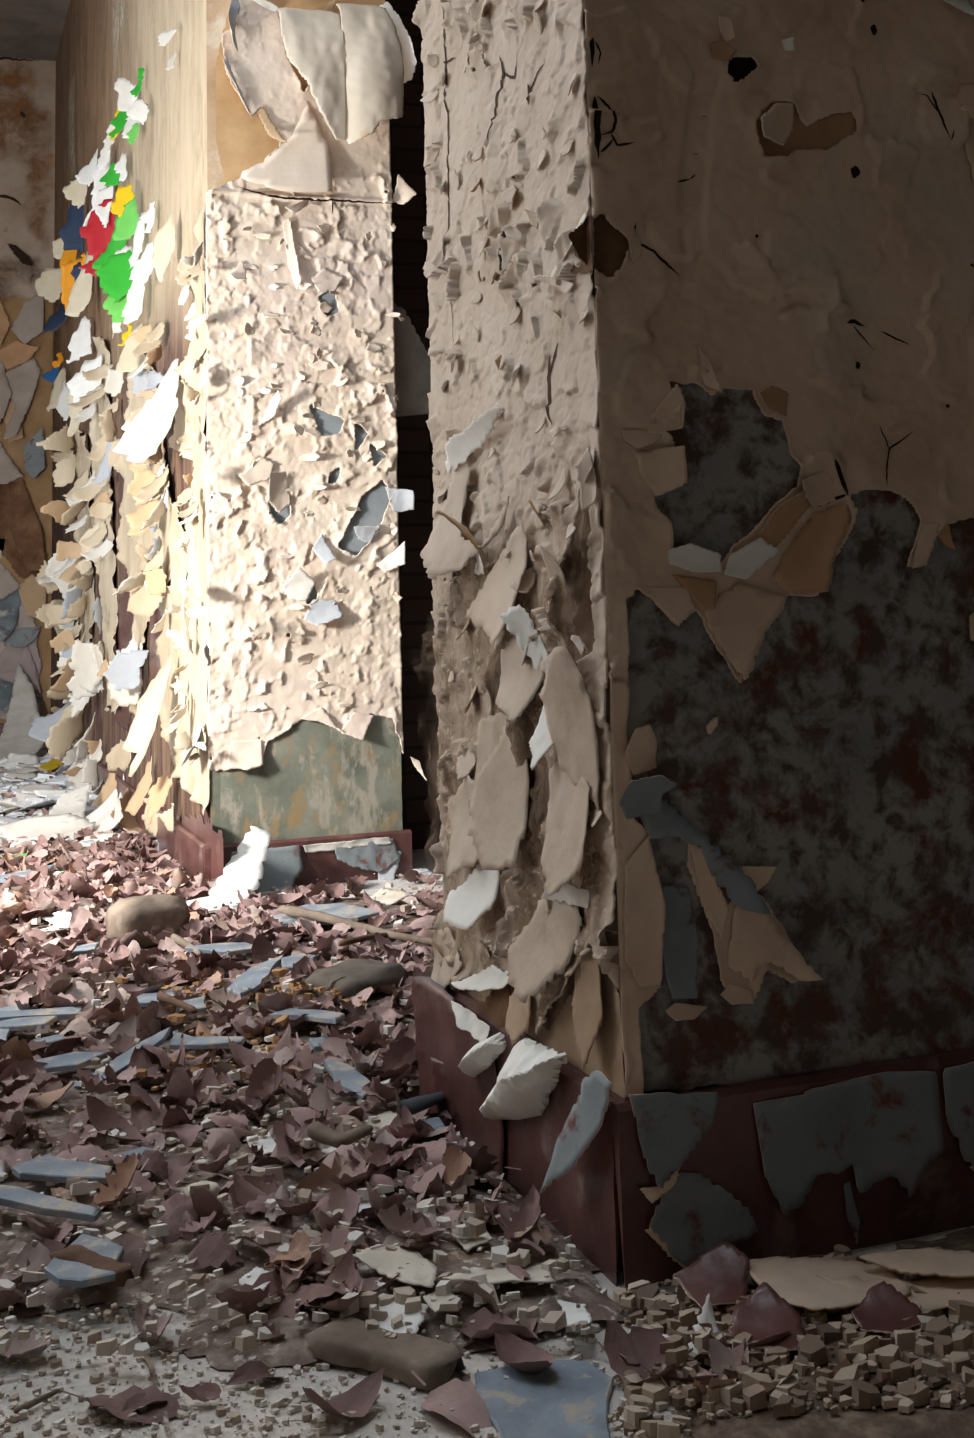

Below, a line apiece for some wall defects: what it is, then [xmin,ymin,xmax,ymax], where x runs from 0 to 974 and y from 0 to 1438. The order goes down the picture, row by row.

crack [0,54,40,62]
peeling [158,27,177,71]
peeling [531,0,545,35]
peeling [709,15,757,82]
leakage [0,68,46,150]
peeling [756,102,857,156]
peeling [216,0,446,386]
peeling [501,185,539,229]
peeling [532,208,641,294]
peeling [470,267,498,304]
peeling [0,238,427,911]
peeling [233,343,974,1351]